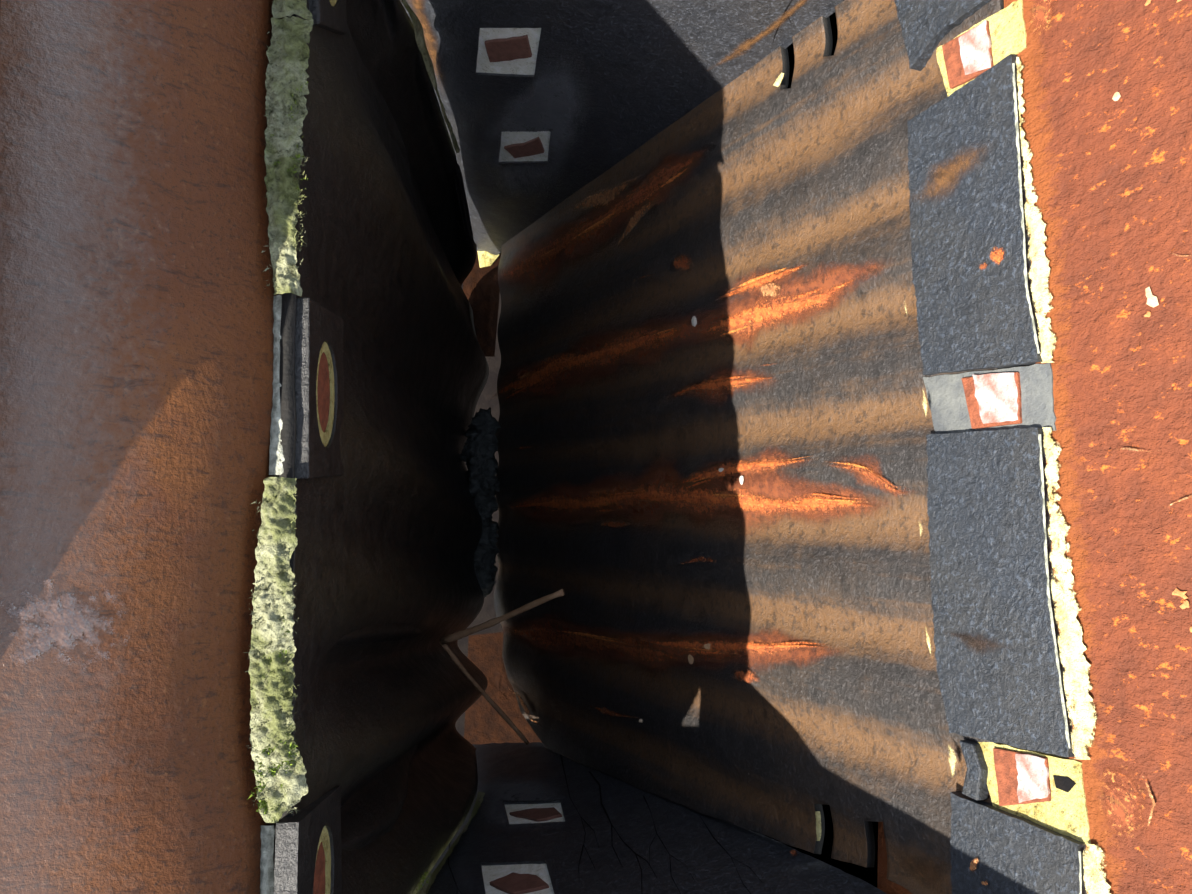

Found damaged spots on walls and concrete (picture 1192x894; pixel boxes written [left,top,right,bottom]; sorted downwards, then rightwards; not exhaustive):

rust [725,0,806,60]
rust [463,252,501,357]
rust [498,266,874,402]
rust [512,452,874,528]
rust [837,462,901,494]
rust [464,617,827,745]